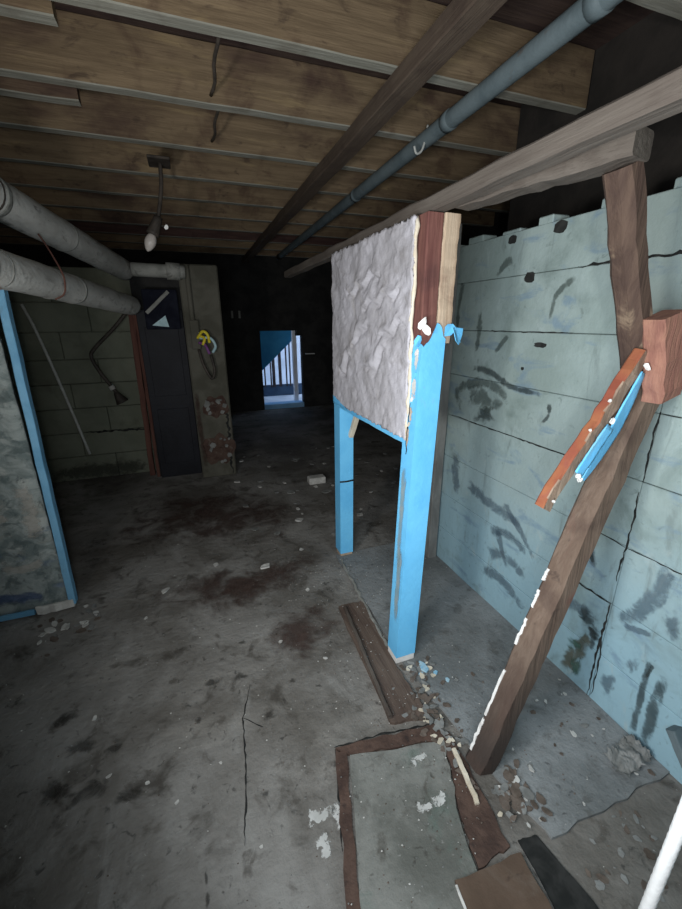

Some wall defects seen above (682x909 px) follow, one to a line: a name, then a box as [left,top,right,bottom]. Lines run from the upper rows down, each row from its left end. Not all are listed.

crack [579,412,682,695]
crack [242,686,263,845]